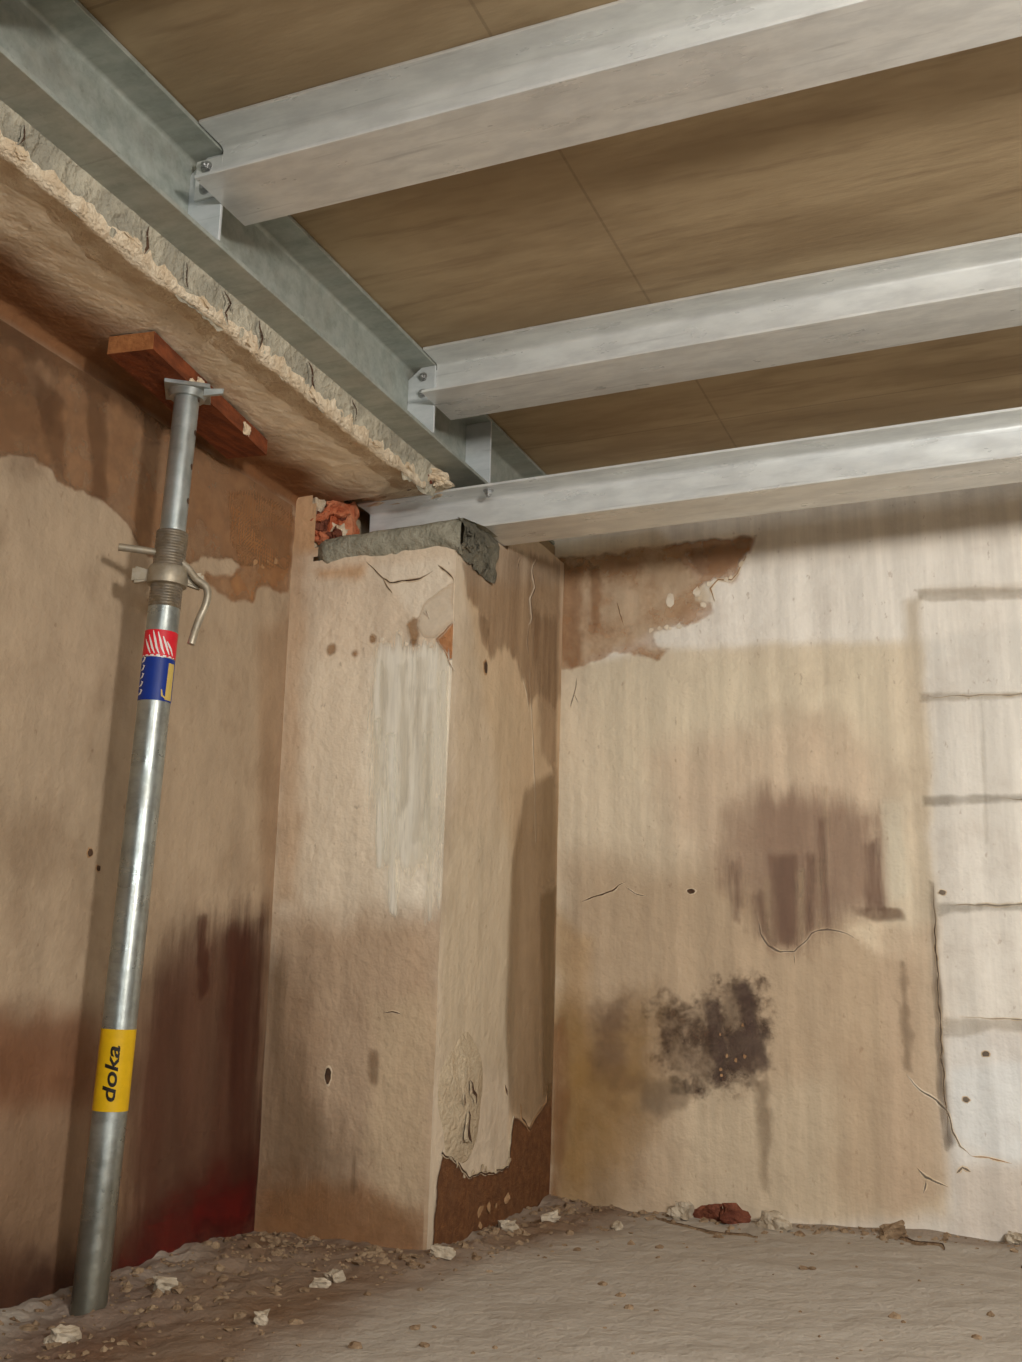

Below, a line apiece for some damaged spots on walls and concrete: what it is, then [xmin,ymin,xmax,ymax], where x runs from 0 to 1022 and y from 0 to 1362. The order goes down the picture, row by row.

spalling [0,130,455,545]
flaking render [559,550,644,585]
flaking render [648,536,752,633]
water stain [761,799,867,941]
water stain [882,909,900,918]
water stain [137,920,259,1252]
spalling [428,1083,561,1260]